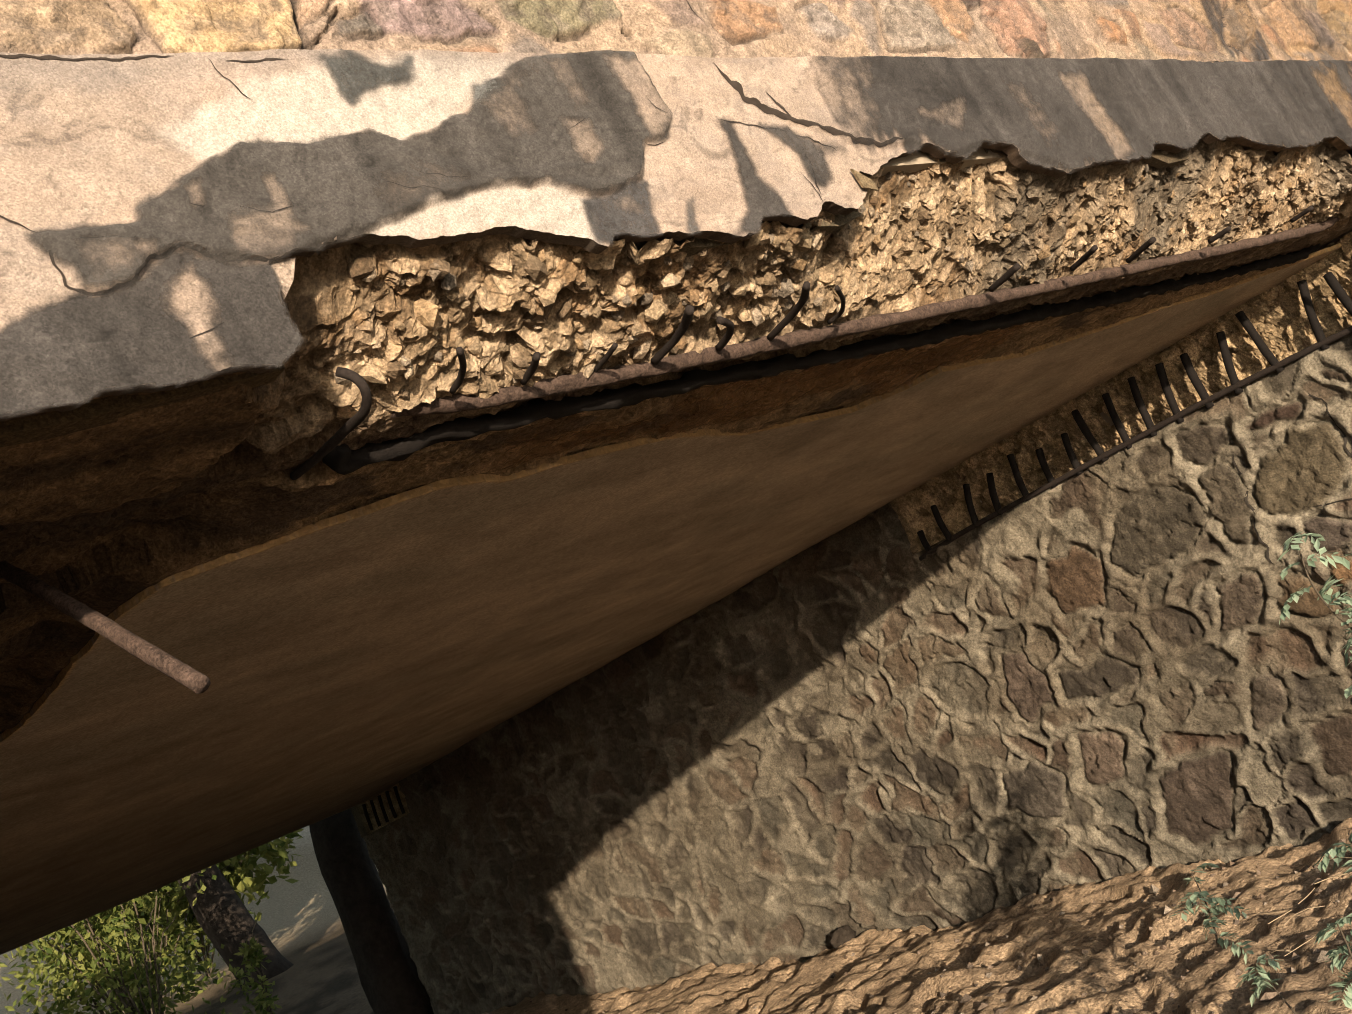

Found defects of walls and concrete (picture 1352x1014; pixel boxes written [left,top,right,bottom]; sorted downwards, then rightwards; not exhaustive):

crack [0,53,169,61]
crack [209,58,283,99]
crack [715,64,901,150]
crack [0,215,207,296]
crack [240,254,279,262]
spalling [0,139,1352,617]
spalling [0,578,95,734]